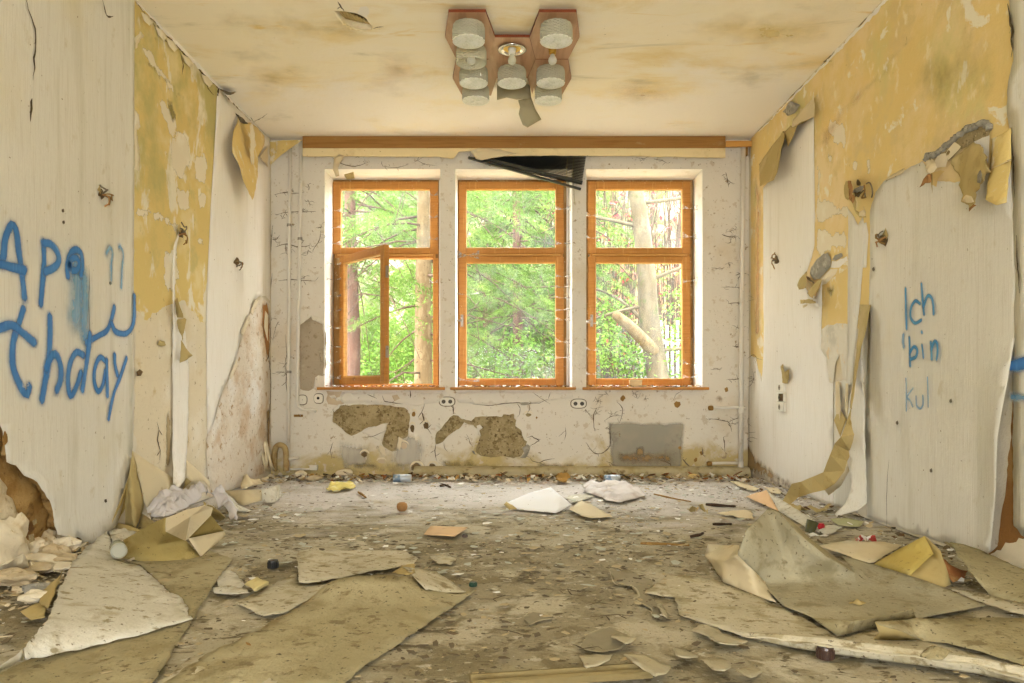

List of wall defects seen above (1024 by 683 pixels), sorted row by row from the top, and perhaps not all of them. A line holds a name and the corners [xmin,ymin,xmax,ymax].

crack [26,0,36,121]
flaking render [335,6,372,31]
peeling [133,1,275,497]
peeling [750,0,1014,422]
flaking render [299,315,573,463]
flaking render [0,429,56,565]
peeling [988,403,1024,569]